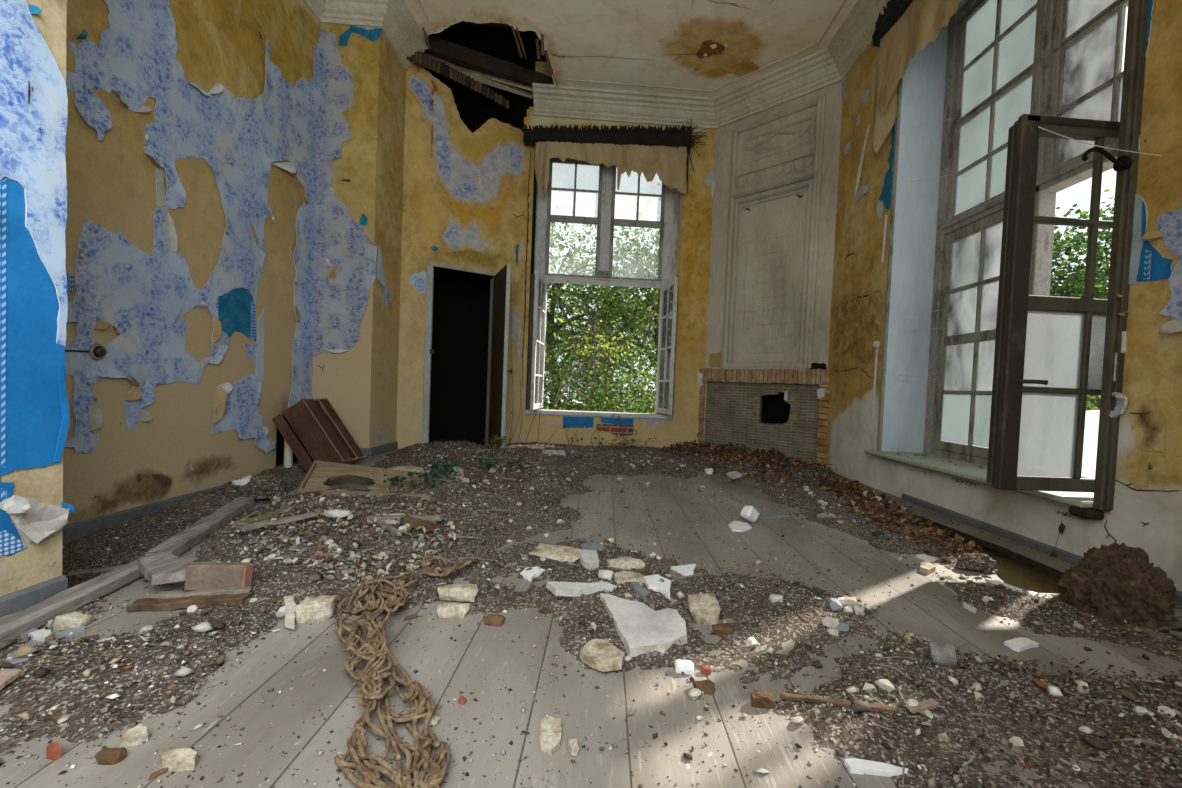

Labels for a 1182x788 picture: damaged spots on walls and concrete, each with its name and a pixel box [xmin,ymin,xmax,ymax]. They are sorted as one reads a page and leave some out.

crack [550,52,648,60]
damp [654,11,778,84]
peeling [410,79,435,112]
peeling [434,132,479,198]
damp [175,448,241,494]